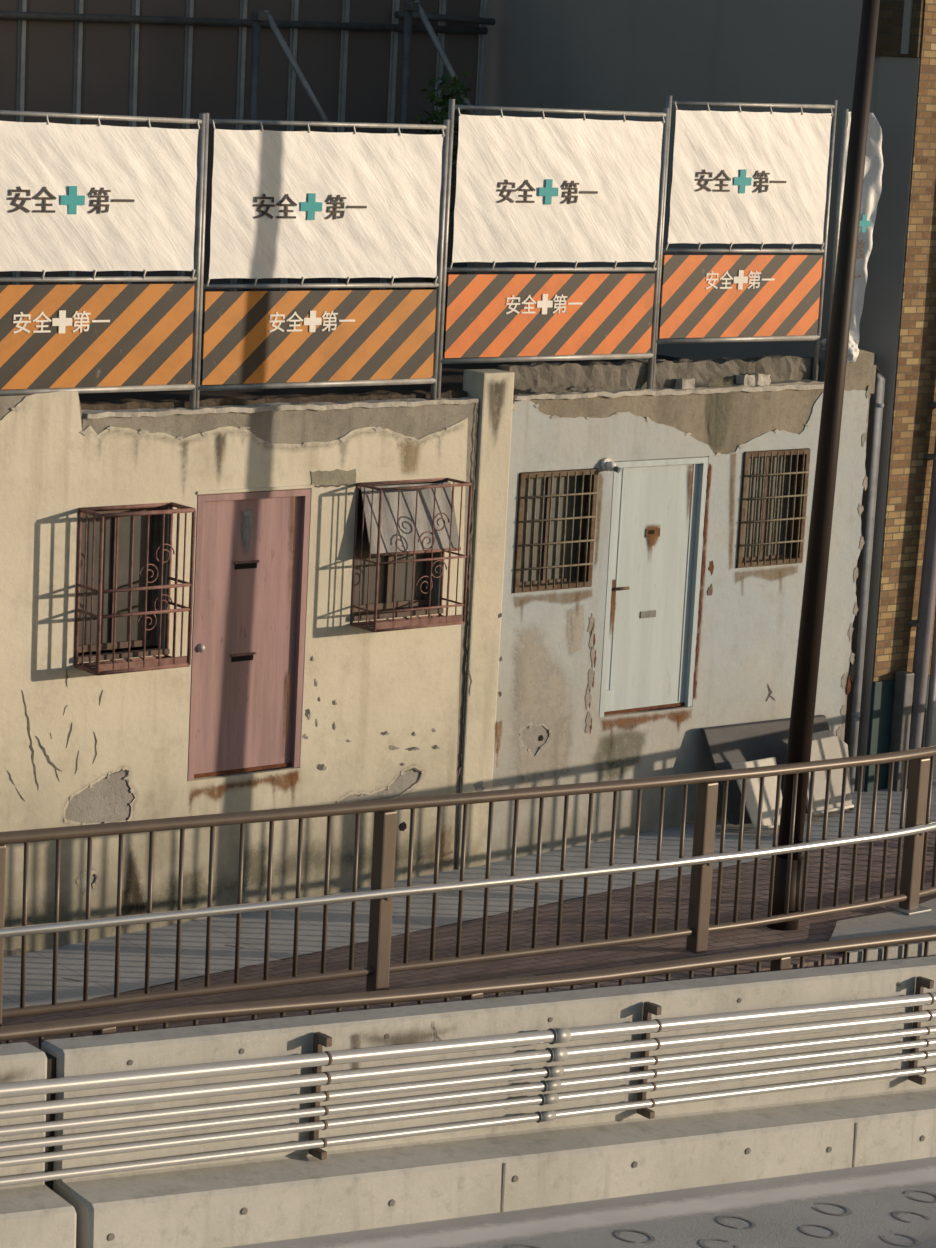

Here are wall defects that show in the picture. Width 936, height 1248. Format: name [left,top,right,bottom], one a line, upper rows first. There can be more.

spalling [0,396,25,420]
spalling [80,403,478,447]
spalling [513,389,824,456]
spalling [844,353,876,447]
rust [603,464,712,730]
crack [7,668,103,801]
spalling [63,768,135,825]
rust [192,772,298,799]
spalling [336,728,440,803]